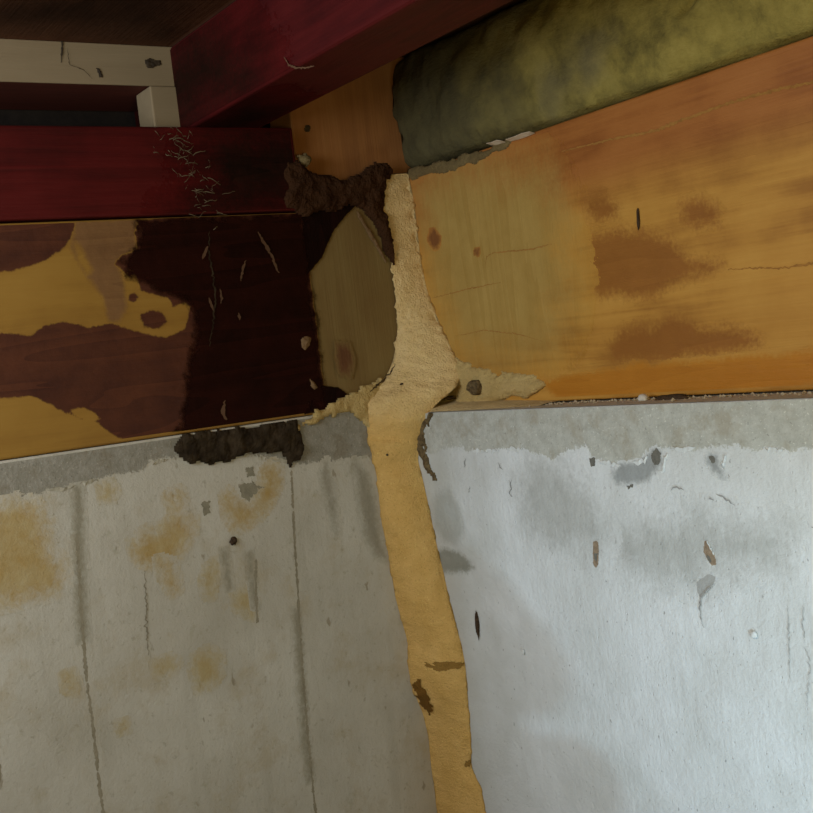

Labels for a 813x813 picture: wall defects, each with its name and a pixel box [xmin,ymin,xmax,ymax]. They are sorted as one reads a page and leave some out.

damp [0,0,355,439]
damp [409,132,813,397]
peeling [0,437,183,497]
peeling [239,412,372,502]
peeling [417,392,813,489]